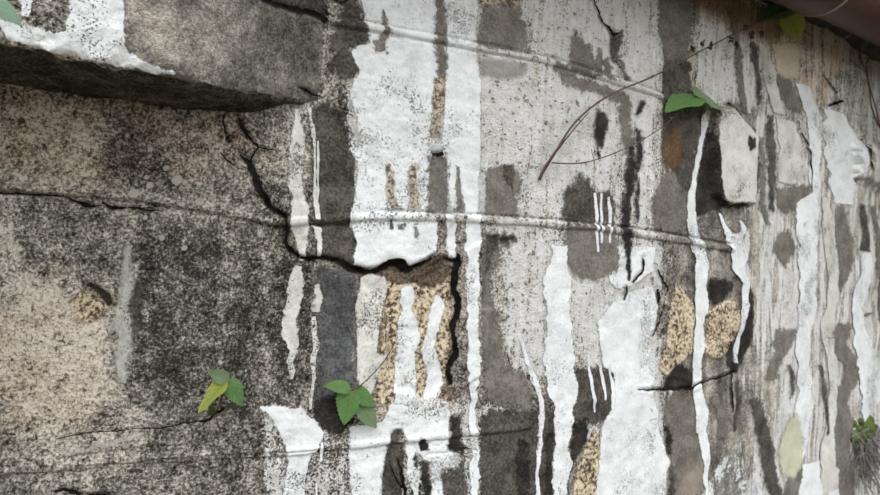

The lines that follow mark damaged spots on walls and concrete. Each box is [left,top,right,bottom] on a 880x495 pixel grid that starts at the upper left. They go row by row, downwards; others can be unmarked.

leakage [267,0,328,16]
crack [263,0,347,21]
crack [0,192,159,211]
spalling [69,283,112,323]
crack [220,114,462,385]
spalling [356,252,452,411]
leakage [281,0,531,495]
leakage [479,29,705,495]
spalling [659,285,695,375]
spalling [705,299,742,359]
leakage [651,0,880,495]
crack [56,409,225,439]